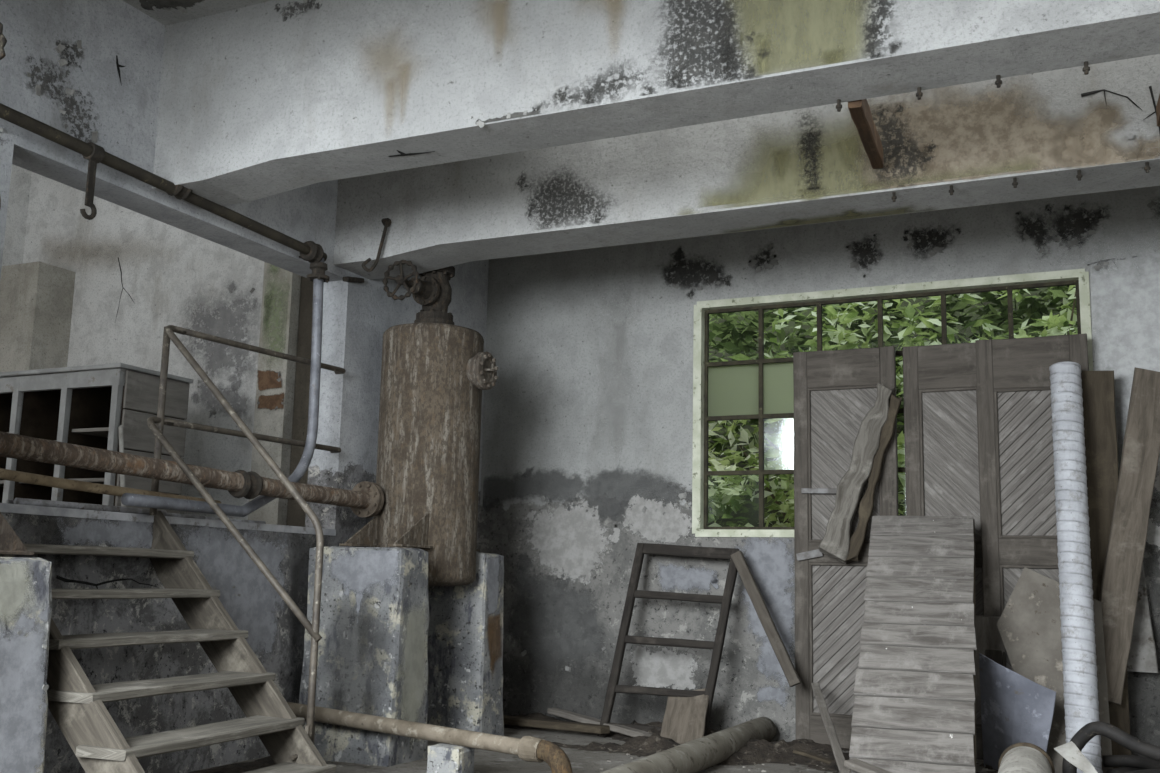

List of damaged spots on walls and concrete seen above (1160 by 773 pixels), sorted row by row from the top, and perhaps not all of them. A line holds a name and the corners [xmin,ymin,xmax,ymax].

water stain [660,0,900,88]
water stain [705,89,1124,208]
water stain [517,174,608,229]
water stain [663,248,732,297]
water stain [846,234,883,278]
water stain [903,225,961,258]
water stain [1016,203,1108,253]
peeling [1146,518,1160,570]
rust [488,615,501,673]